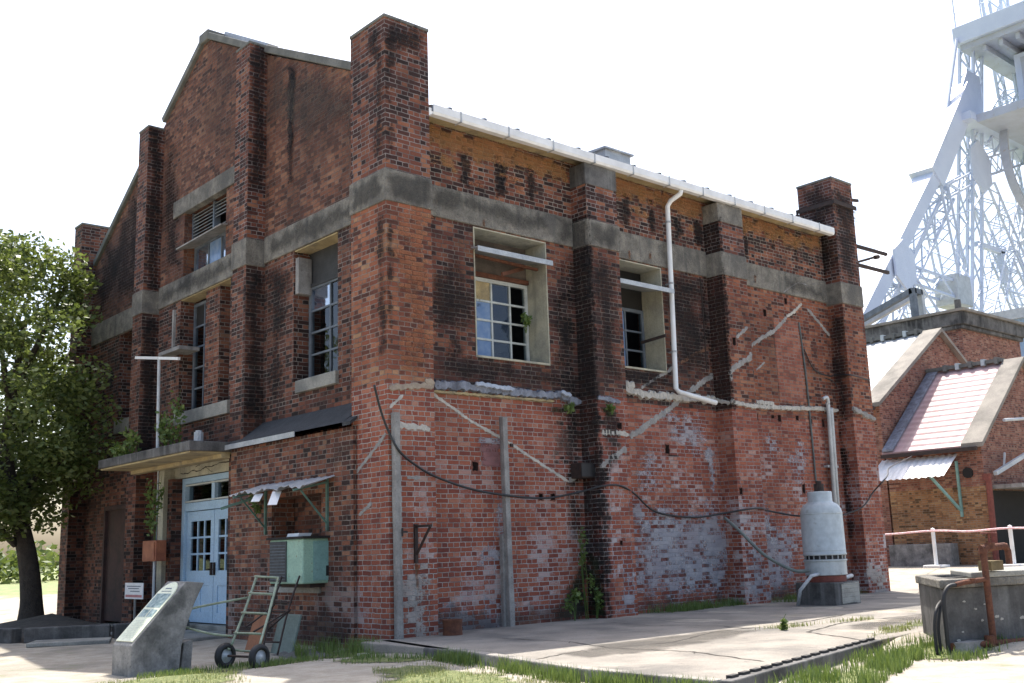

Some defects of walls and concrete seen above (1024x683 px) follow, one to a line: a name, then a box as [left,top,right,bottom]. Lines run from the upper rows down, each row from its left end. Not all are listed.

damp [284,66,295,184]
damp [365,21,423,154]
damp [429,123,568,201]
damp [558,214,728,618]